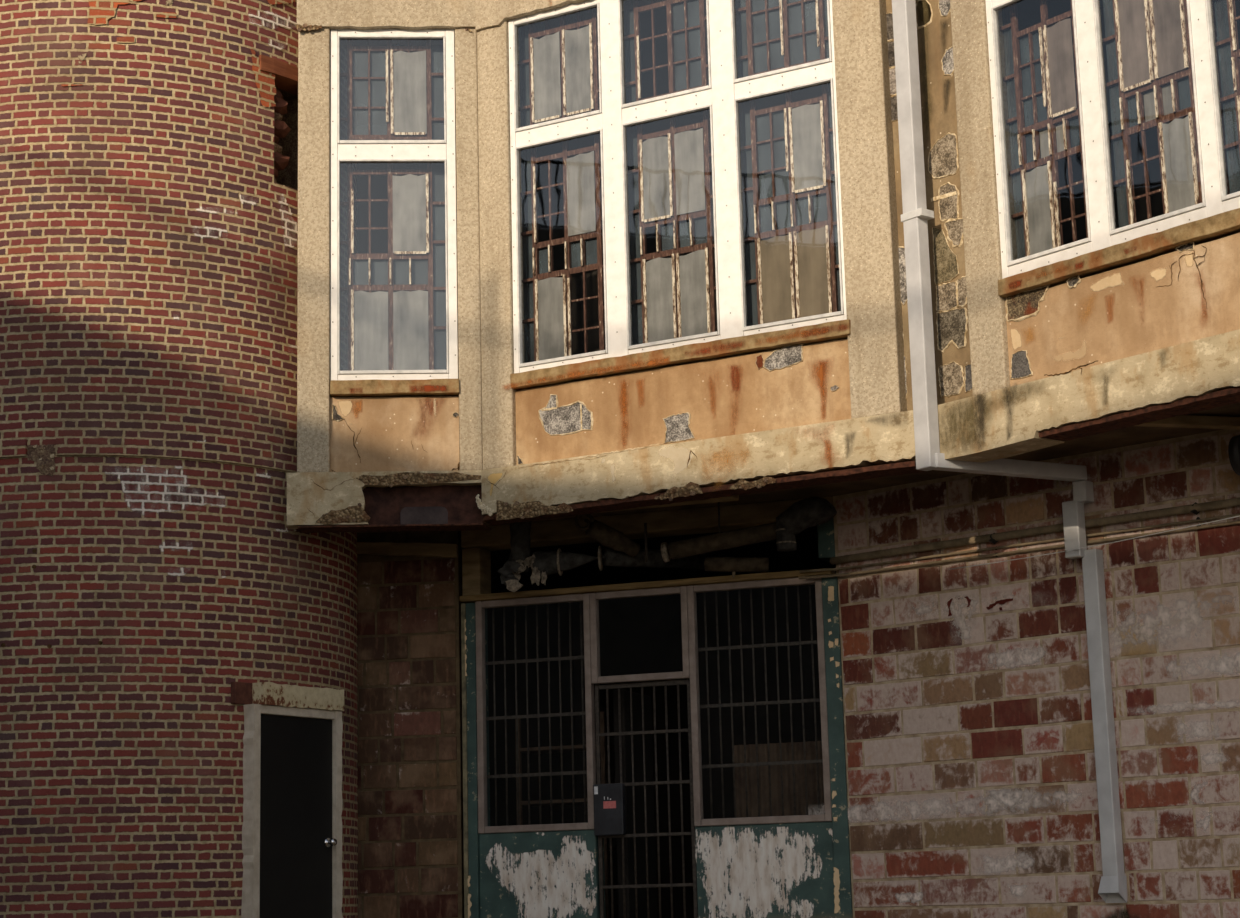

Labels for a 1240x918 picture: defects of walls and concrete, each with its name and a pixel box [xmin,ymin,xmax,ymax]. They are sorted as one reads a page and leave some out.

spalling [886,13,898,122]
spalling [928,133,972,398]
crack [1158,245,1207,307]
spalling [755,344,803,372]
spalling [1005,285,1050,380]
spalling [538,394,593,436]
spalling [662,412,695,444]
rust [816,363,825,416]
damp [941,395,989,445]
spalling [356,471,573,521]
peeling [486,832,597,918]
peeling [695,778,840,918]